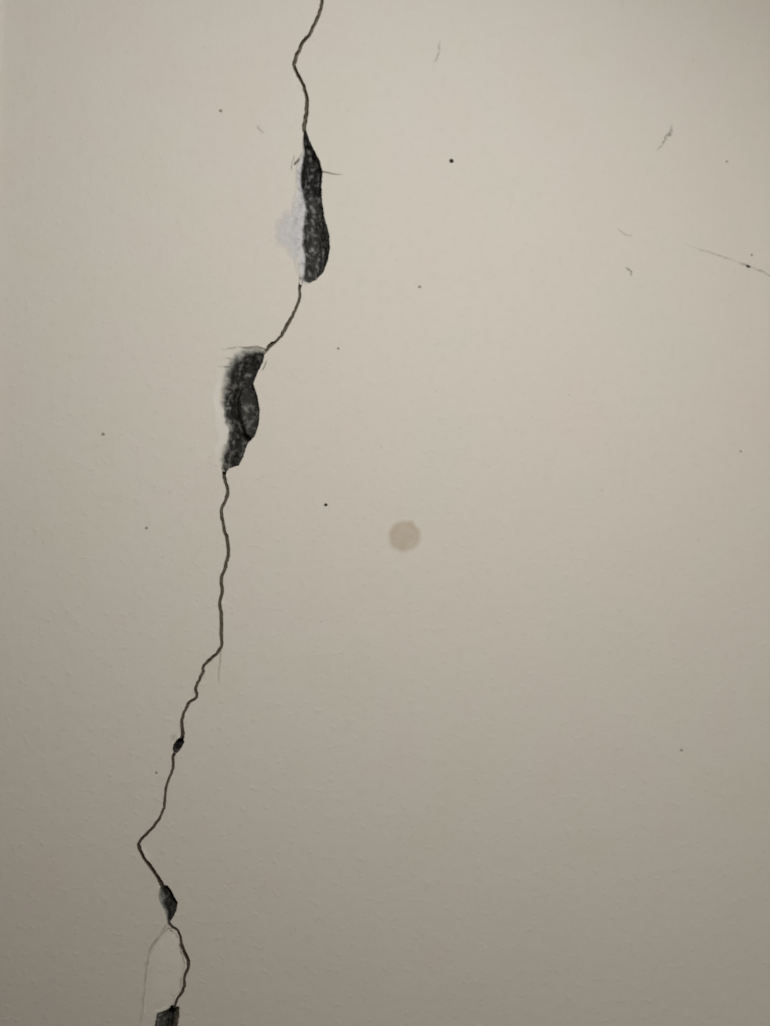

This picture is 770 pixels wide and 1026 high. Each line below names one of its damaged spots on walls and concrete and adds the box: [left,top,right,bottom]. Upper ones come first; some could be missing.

crack [292,0,324,135]
flaking render [278,131,330,285]
crack [262,278,303,354]
flaking render [211,346,266,473]
crack [137,460,230,888]
flaking render [142,885,185,1026]
crack [168,922,190,1008]